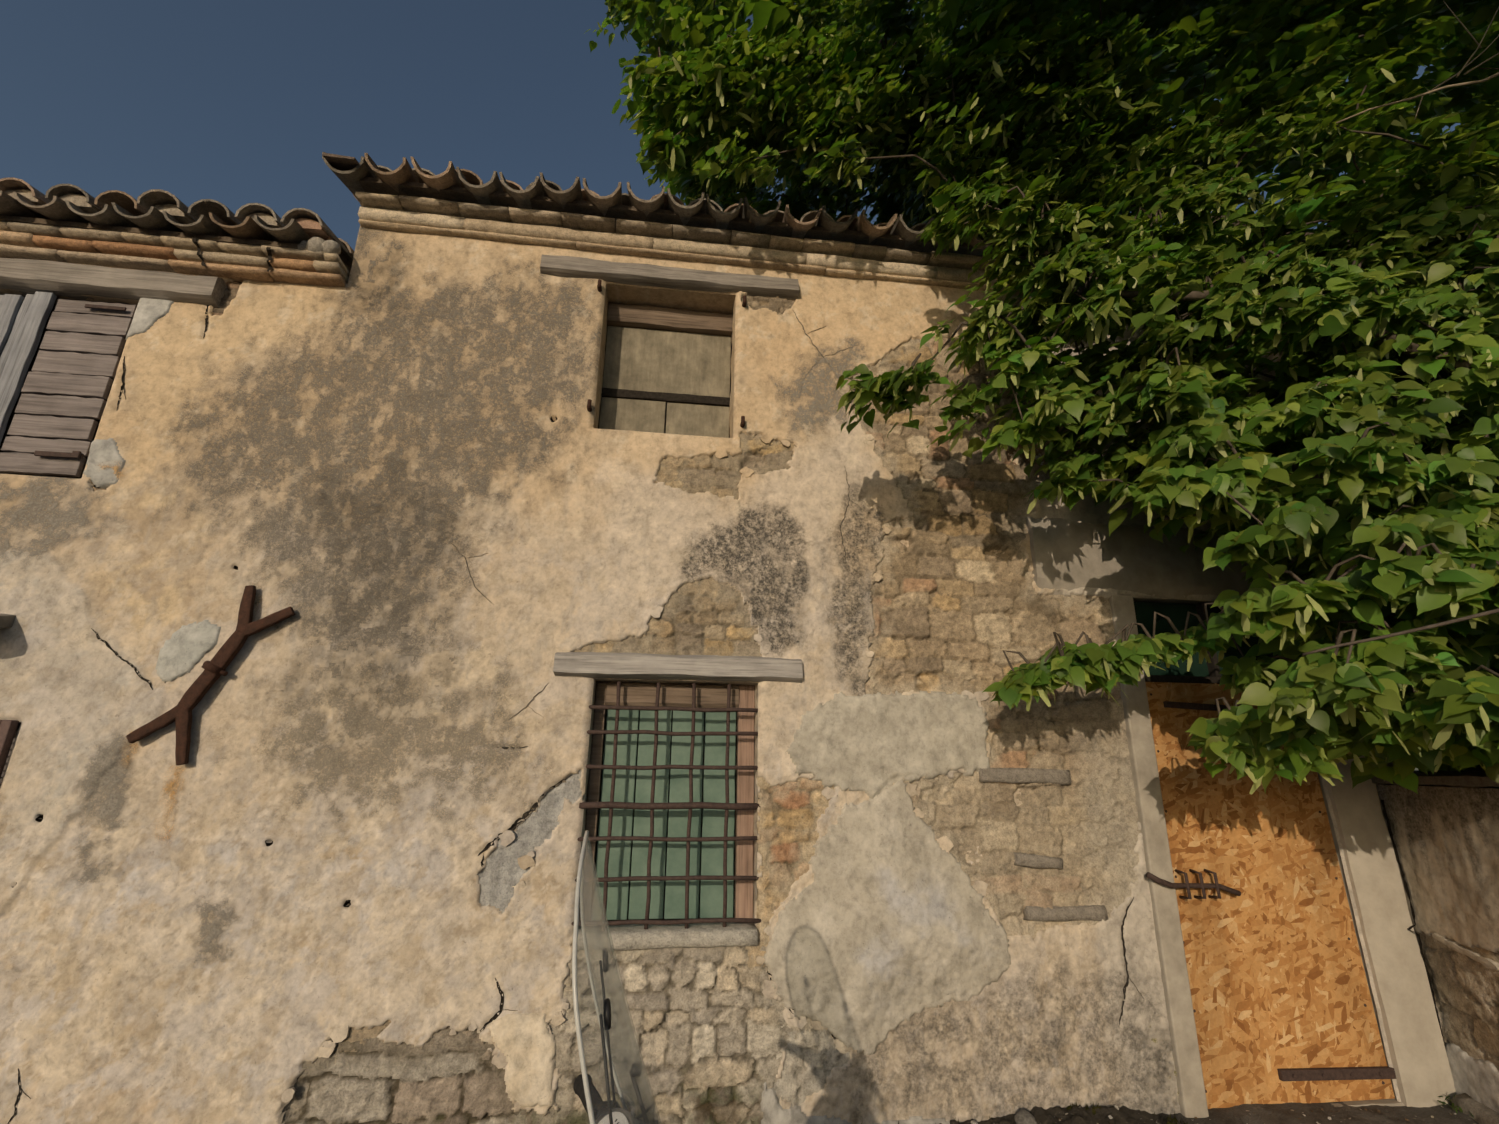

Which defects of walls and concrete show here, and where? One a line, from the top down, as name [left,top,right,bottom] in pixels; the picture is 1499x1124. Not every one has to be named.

crack [91,628,153,690]
damp [173,227,601,816]
spalling [560,577,768,657]
spalling [653,432,797,500]
damp [682,507,807,652]
spalling [838,338,1140,939]
spalling [281,769,851,1124]
crack [1119,897,1142,1025]
crack [7,1068,31,1124]